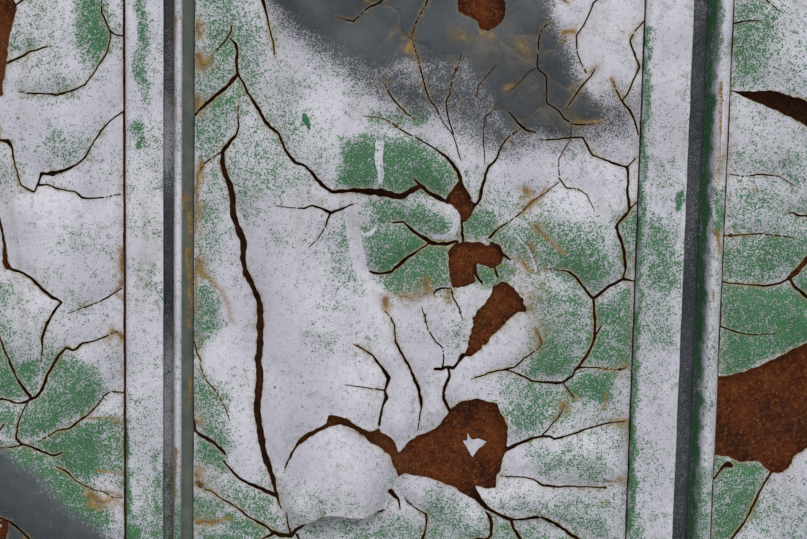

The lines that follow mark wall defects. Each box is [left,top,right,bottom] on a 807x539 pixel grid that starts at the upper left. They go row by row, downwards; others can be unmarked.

spalling [0,0,30,155]
crack [18,0,122,96]
spalling [444,0,520,44]
crack [613,22,643,134]
crack [1,112,122,199]
spalling [0,211,25,279]
crack [194,0,638,539]
spalling [435,166,535,370]
crack [723,275,807,299]
crack [0,268,122,499]
spalling [714,340,807,486]
spalling [0,509,22,539]